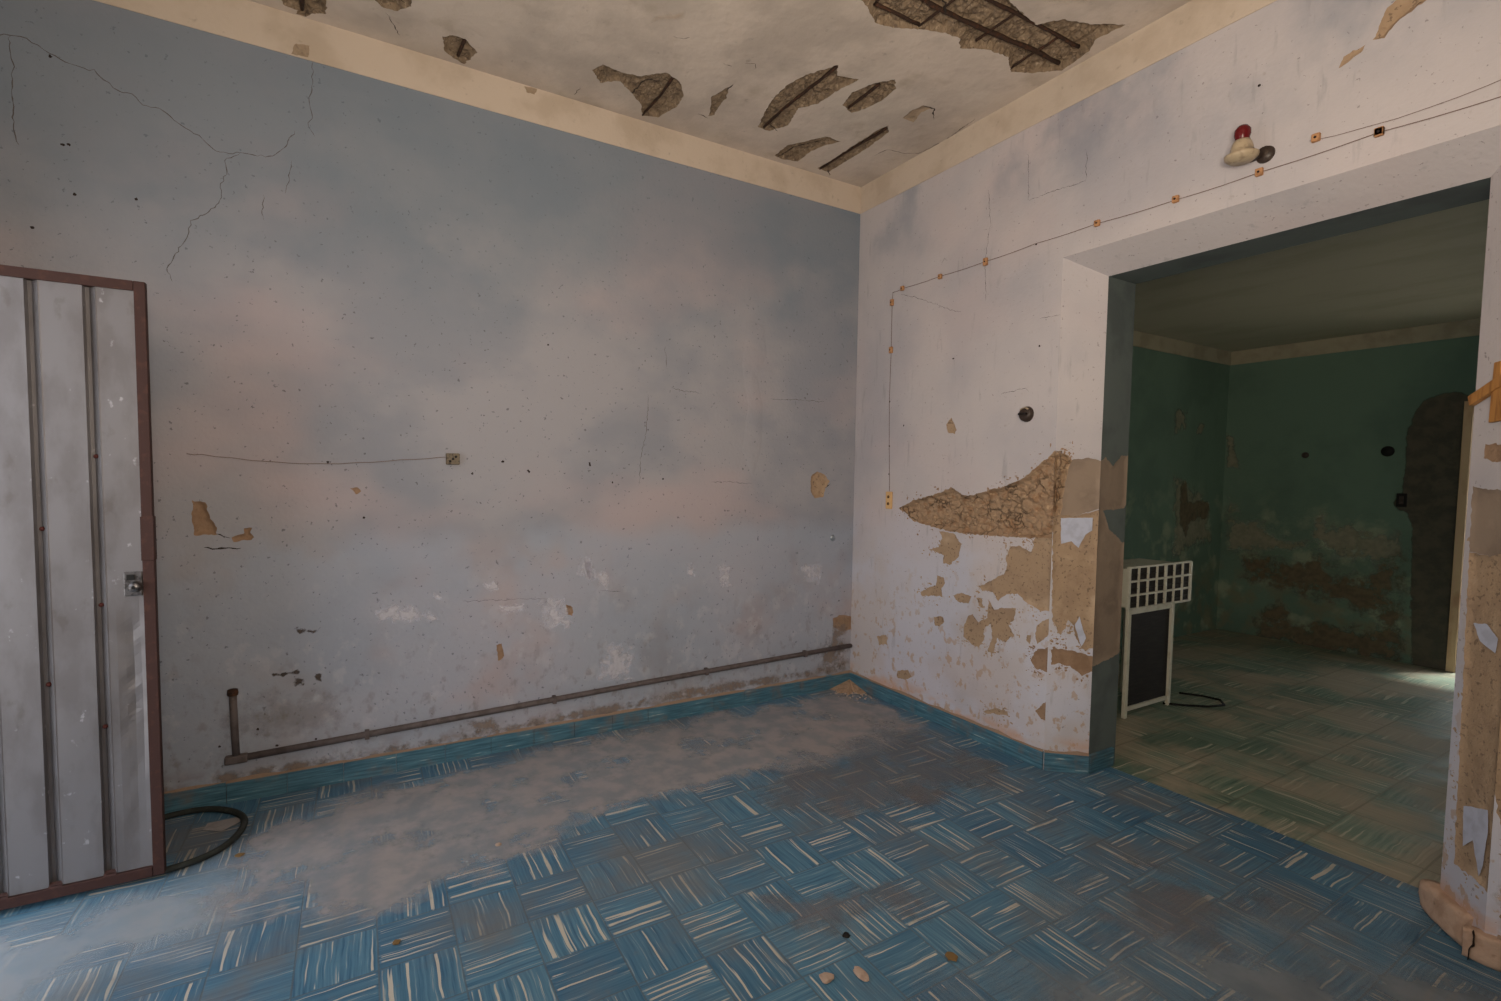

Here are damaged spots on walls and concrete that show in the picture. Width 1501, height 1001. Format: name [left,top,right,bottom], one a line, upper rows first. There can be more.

spalling [282,0,327,17]
spalling [375,0,412,11]
spalling [862,0,1124,73]
spalling [1339,0,1426,68]
spalling [593,65,684,117]
spalling [702,85,733,118]
crack [0,34,314,280]
peeling [1484,443,1501,462]
spalling [895,441,1128,720]
flaking render [1444,537,1501,909]